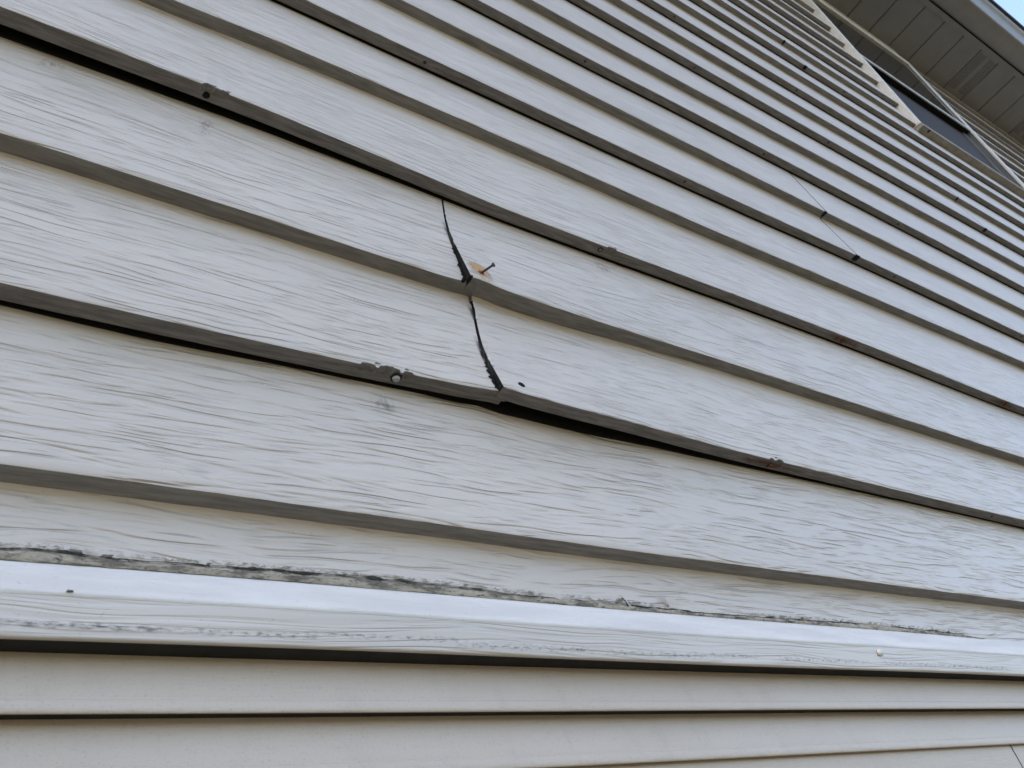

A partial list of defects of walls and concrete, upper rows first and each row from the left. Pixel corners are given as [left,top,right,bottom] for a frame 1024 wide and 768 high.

crack [442,200,503,396]
rust [470,262,490,276]